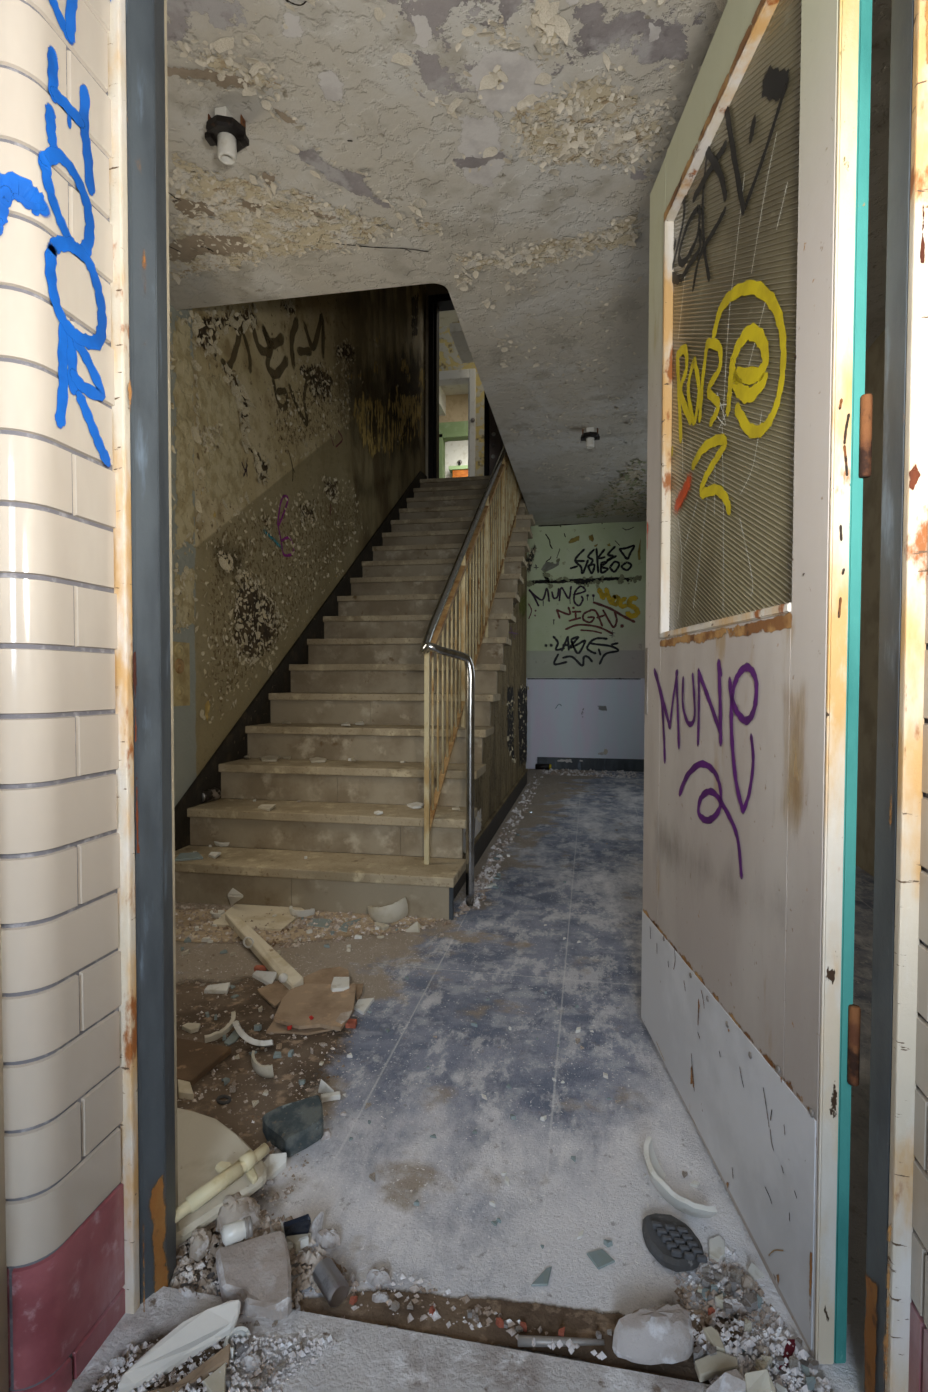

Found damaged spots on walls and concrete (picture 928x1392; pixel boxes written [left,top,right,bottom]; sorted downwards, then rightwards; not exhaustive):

peeling [167,0,443,285]
peeling [374,0,728,188]
peeling [454,205,643,291]
flaking render [577,459,647,518]
rust [909,464,921,490]
rust [143,1176,169,1312]